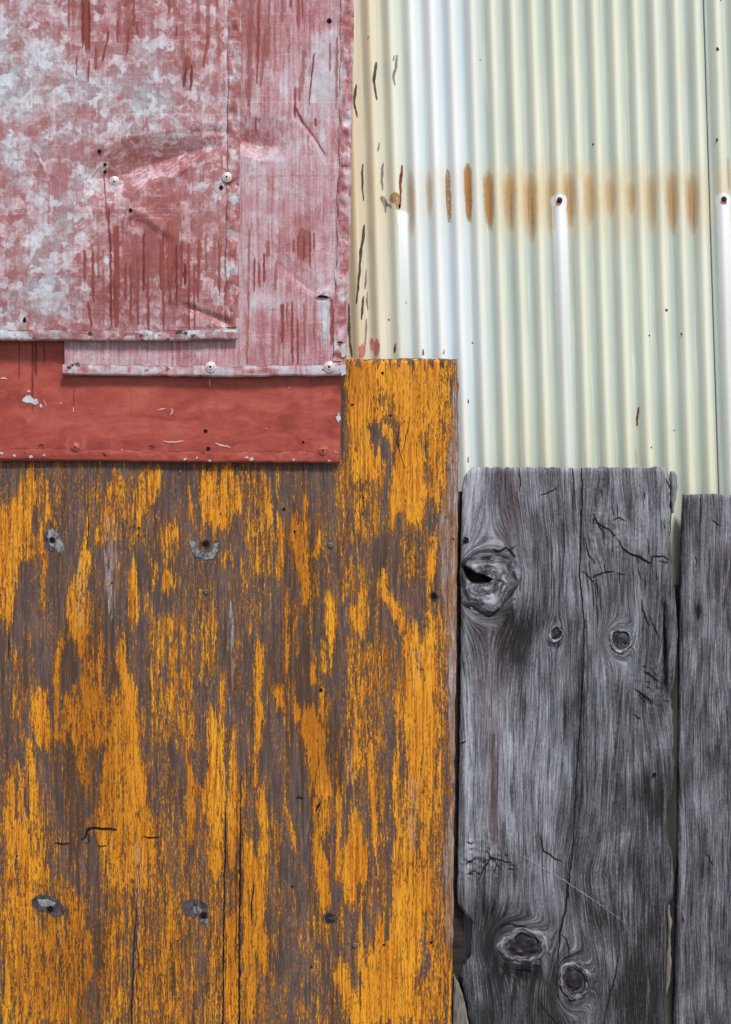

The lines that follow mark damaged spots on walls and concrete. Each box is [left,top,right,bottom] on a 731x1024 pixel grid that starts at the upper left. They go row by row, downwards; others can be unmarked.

rust [485,176,493,229]
peeling [320,299,328,341]
peeling [0,343,454,1024]
crack [474,468,672,1024]
crack [55,826,117,846]
crack [464,842,515,879]